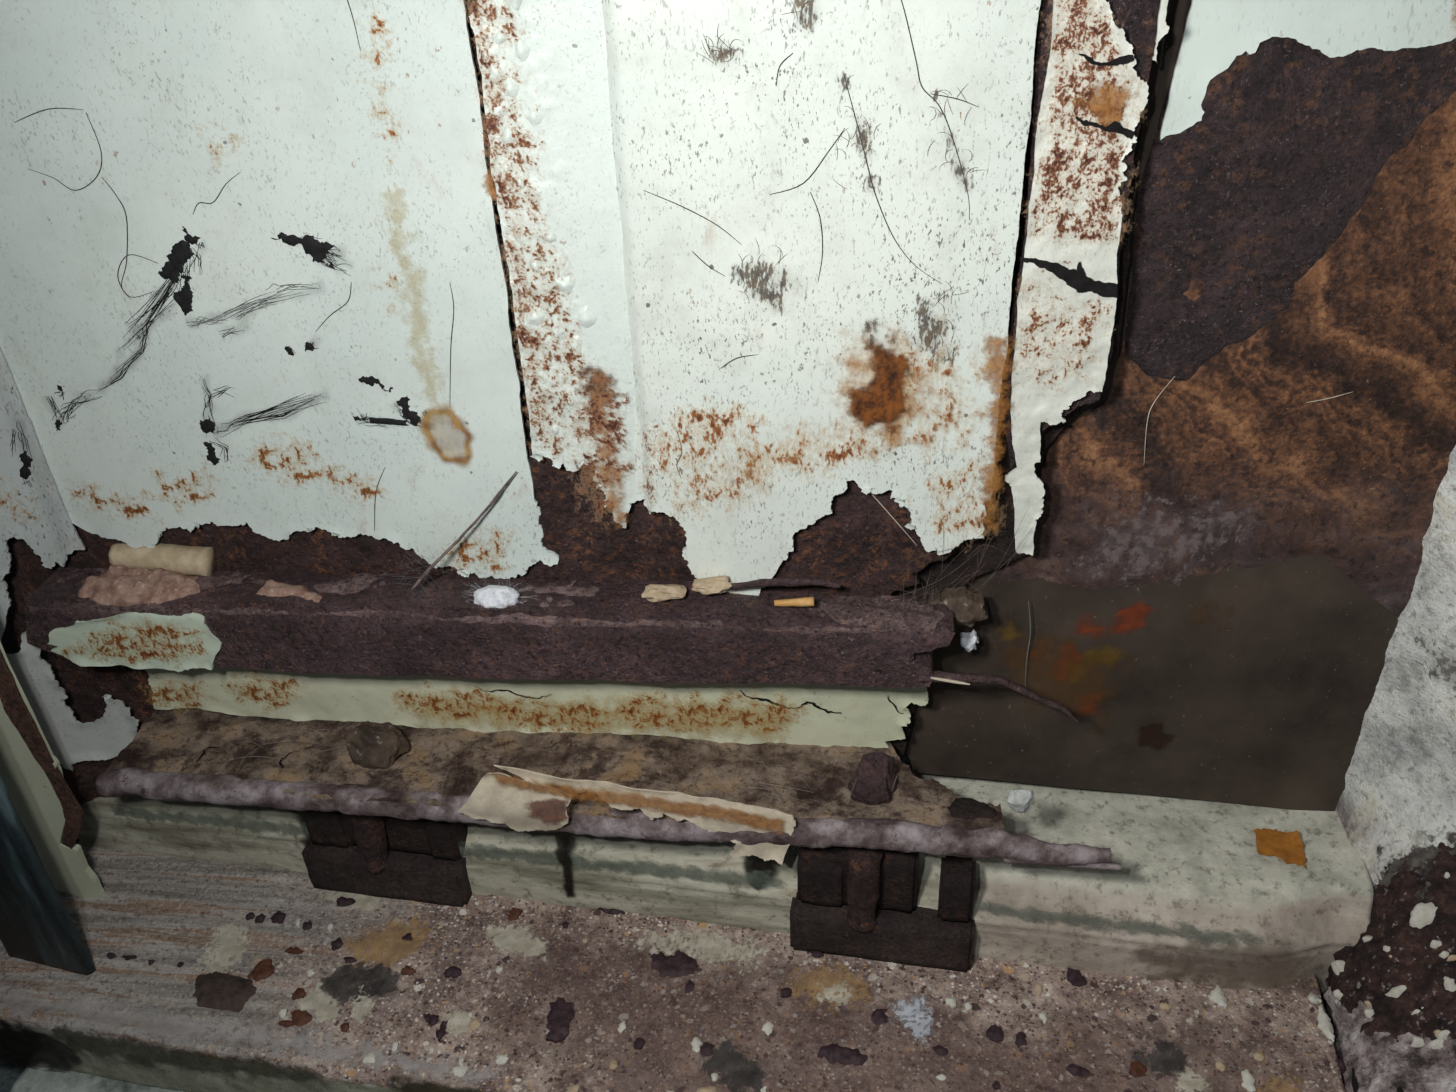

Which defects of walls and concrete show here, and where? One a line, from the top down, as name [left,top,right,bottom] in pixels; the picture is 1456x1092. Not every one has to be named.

rust [464,0,1456,618]
crack [1020,257,1118,298]
peeling [9,527,127,651]
peeling [155,521,477,577]
rust [252,443,382,500]
peeling [511,441,697,582]
peeling [761,480,955,597]
leakage [1066,490,1260,632]
rust [395,682,805,733]